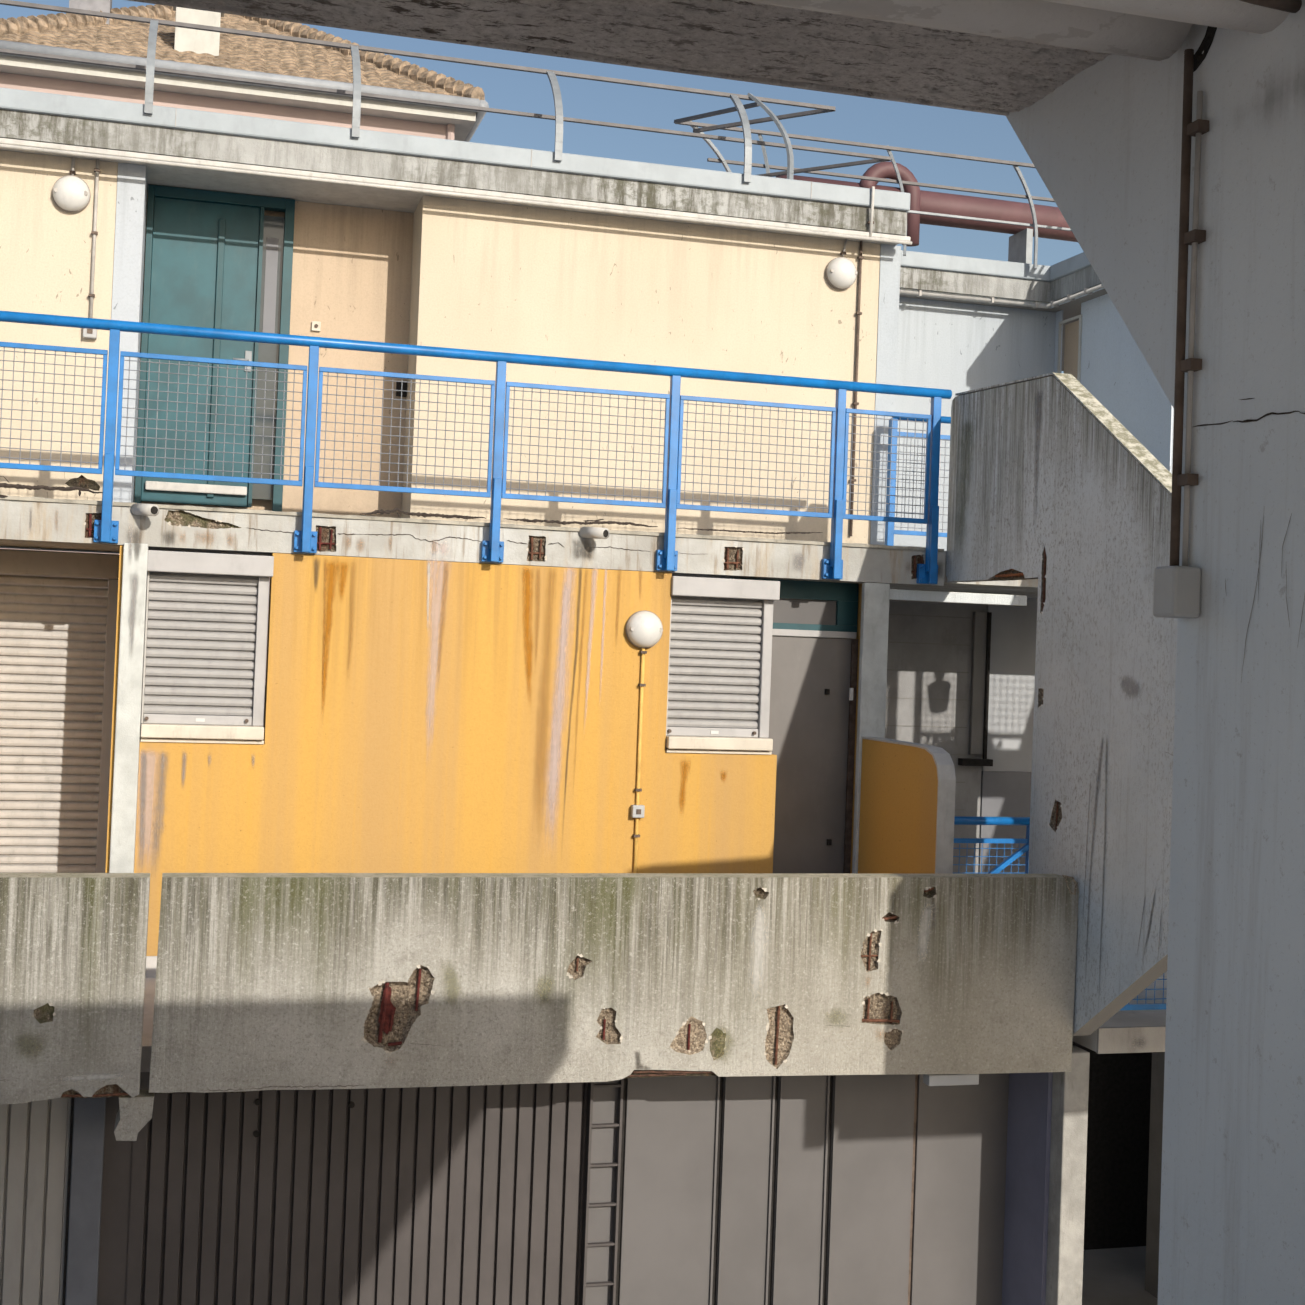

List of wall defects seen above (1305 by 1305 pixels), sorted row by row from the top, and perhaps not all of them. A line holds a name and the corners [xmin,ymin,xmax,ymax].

crack [1194,398,1305,427]
rust [315,525,347,698]
rust [524,535,547,681]
damp [754,910,764,983]
spalling [861,912,900,972]
spalling [361,965,435,1055]
spalling [596,1007,623,1044]
spalling [625,1016,728,1078]
spalling [764,1004,794,1069]
spalling [861,992,904,1051]
spalling [60,1084,130,1098]